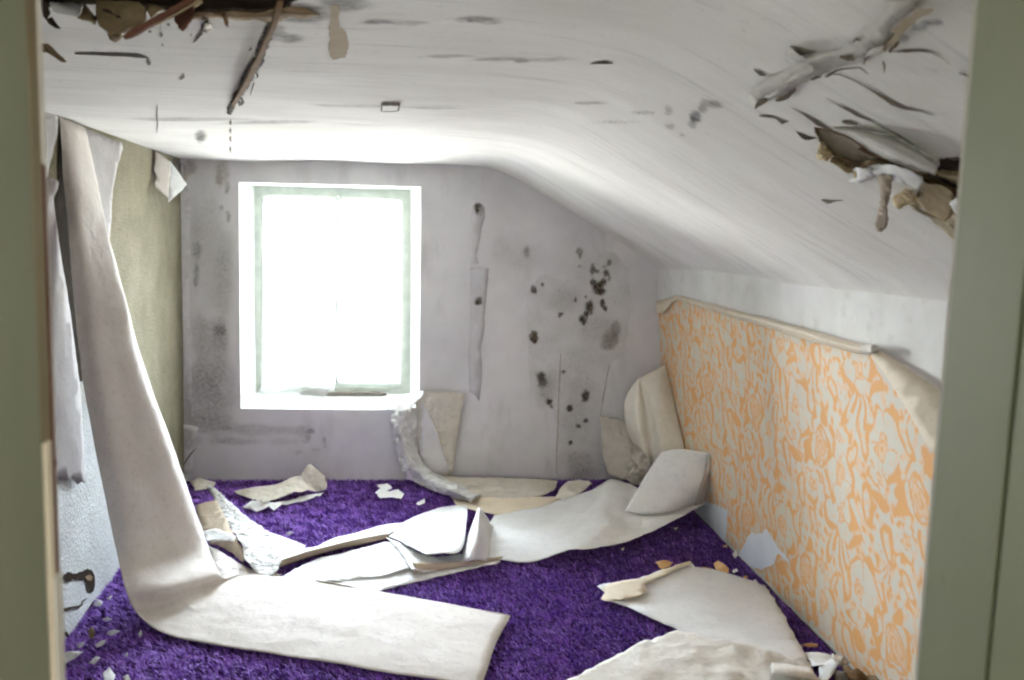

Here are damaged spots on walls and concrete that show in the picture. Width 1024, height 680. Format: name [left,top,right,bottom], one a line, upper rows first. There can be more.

spalling [44,0,96,8]
peeling [328,4,349,60]
peeling [747,0,942,109]
spalling [814,127,961,179]
peeling [154,152,193,474]
peeling [468,202,489,400]
leakage [575,260,610,325]
peeling [739,529,789,569]
spalling [62,569,95,593]